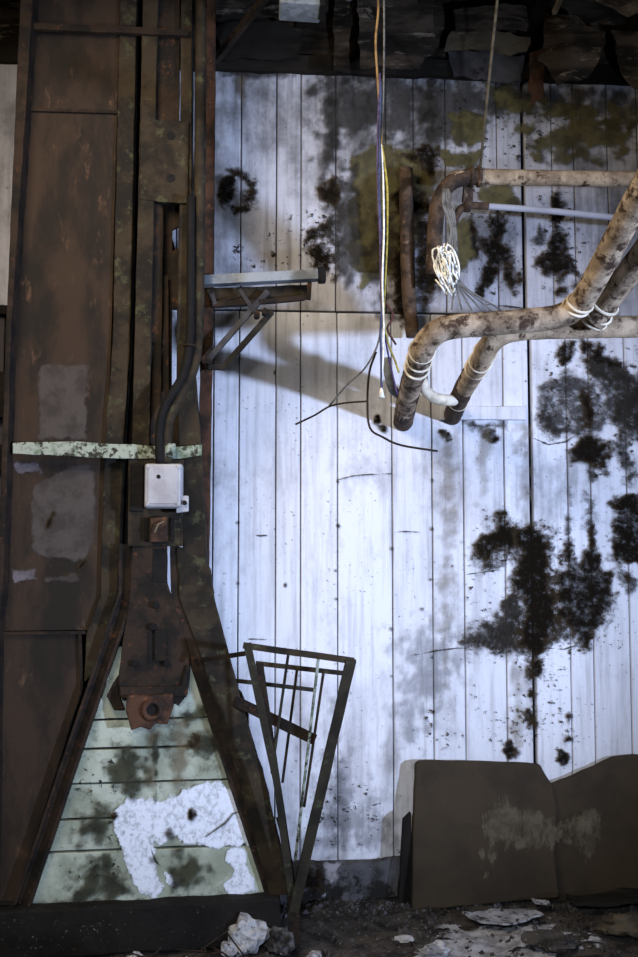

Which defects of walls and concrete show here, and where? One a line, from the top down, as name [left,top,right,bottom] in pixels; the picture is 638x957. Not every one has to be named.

water stain [217,168,258,215]
water stain [234,75,638,313]
water stain [358,189,404,327]
water stain [374,414,388,433]
water stain [459,339,638,728]
water stain [183,706,218,758]
water stain [58,745,151,903]
peeling [114,781,257,898]
water stain [166,828,212,892]